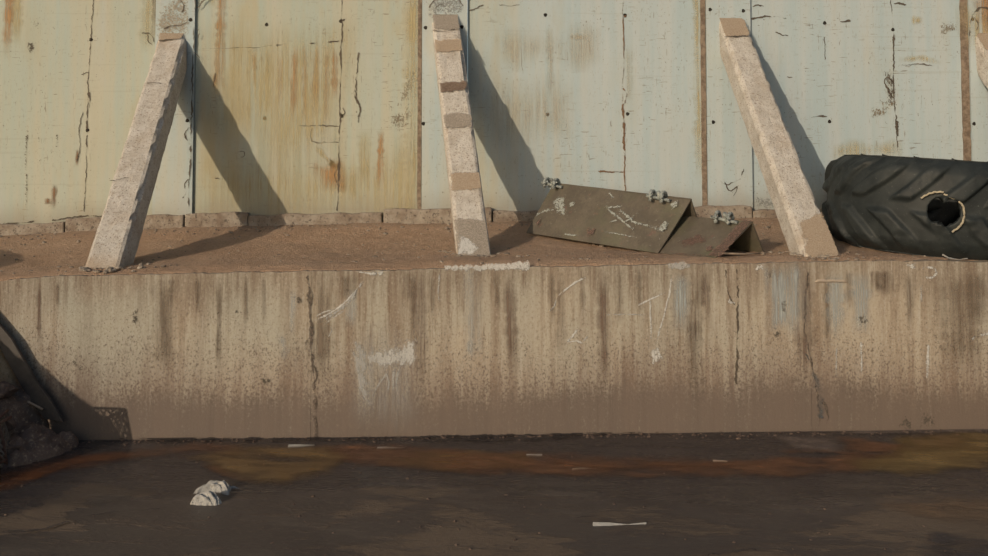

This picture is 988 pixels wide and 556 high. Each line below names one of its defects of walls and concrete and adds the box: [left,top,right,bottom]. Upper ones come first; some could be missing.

crack [119,276,388,441]
leakage [496,290,515,351]
leakage [600,278,686,364]
crack [804,272,829,418]
corrosion [204,448,344,480]
crack [420,432,658,441]
corrosion [860,433,988,472]